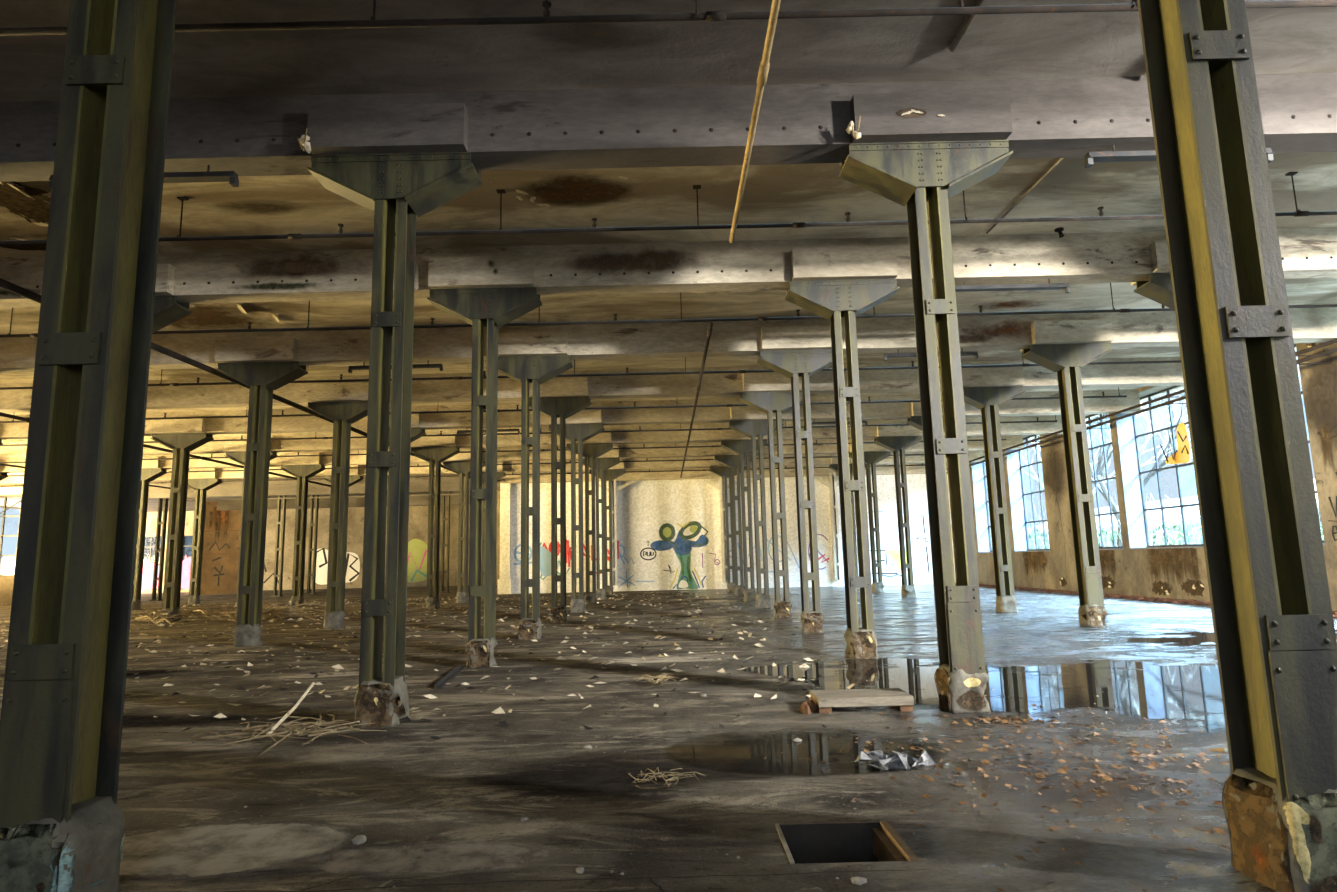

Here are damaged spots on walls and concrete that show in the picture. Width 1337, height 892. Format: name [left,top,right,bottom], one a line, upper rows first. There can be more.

peeling [0,181,51,226]
damp [515,176,629,207]
peeling [0,237,46,251]
damp [575,251,695,272]
damp [1320,427,1333,464]
damp [1023,550,1046,573]
damp [1099,547,1115,571]
damp [1146,545,1199,581]
spalling [48,823,105,892]
spalling [1283,802,1322,884]